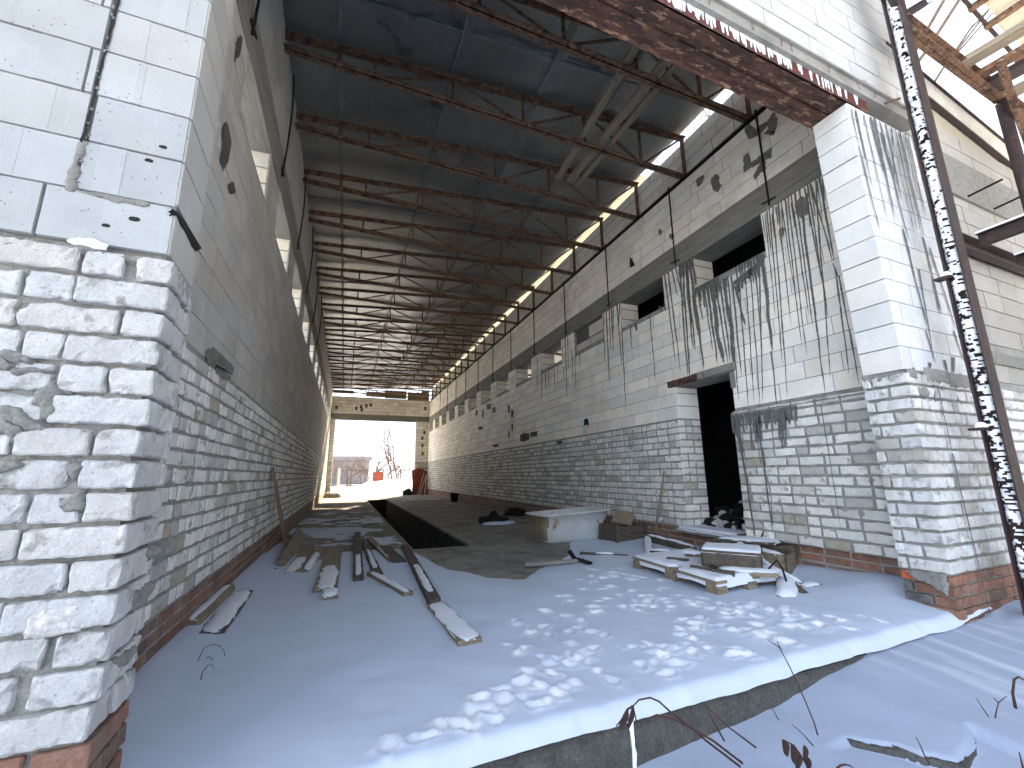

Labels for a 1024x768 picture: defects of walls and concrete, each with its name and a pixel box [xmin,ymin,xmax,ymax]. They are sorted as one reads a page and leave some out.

crack [74,0,120,190]
water stain [603,303,637,403]
water stain [649,176,859,532]
water stain [668,0,964,373]